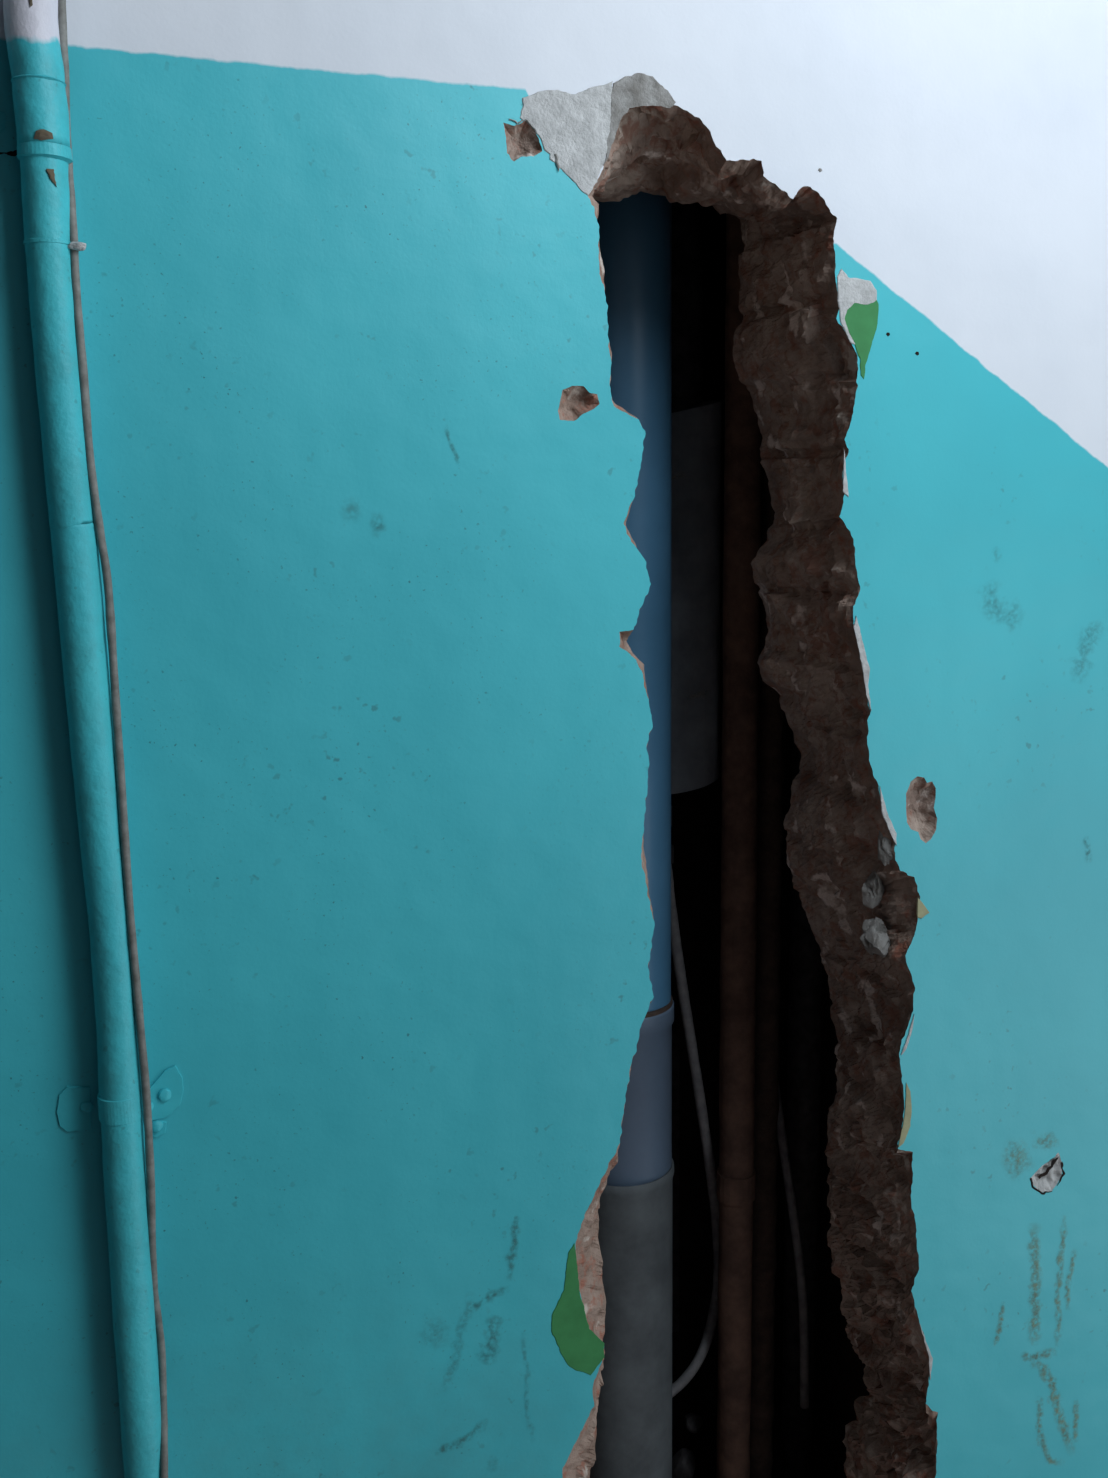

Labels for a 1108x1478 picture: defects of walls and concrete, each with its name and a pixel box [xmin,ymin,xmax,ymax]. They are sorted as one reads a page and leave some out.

spalling [504,73,938,1478]
flaking render [1030,1153,1065,1195]